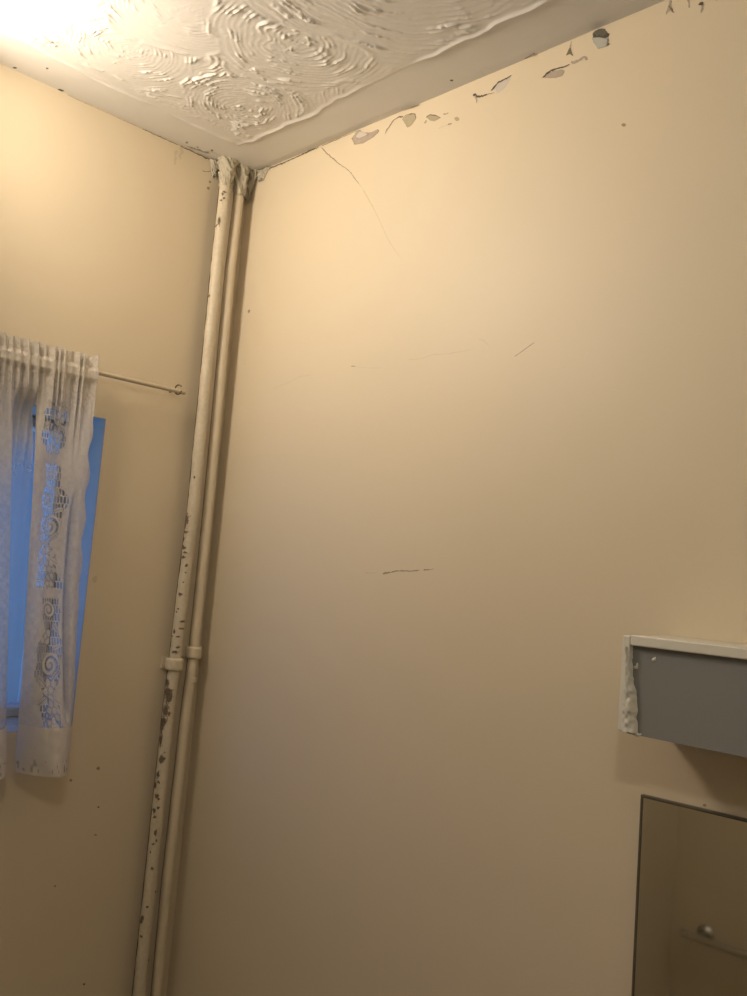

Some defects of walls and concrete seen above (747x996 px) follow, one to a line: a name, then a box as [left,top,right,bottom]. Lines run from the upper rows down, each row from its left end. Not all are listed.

peeling [592,29,609,49]
peeling [543,41,587,78]
peeling [473,75,511,103]
peeling [352,105,459,145]